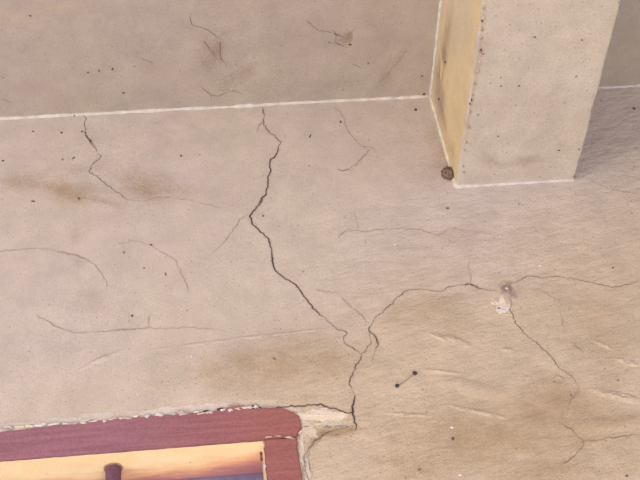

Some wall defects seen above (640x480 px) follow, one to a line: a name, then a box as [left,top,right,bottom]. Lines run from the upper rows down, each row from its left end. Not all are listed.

crack [83,115,221,208]
crack [3,248,107,285]
crack [221,107,640,479]
spalling [490,295,511,315]
crack [37,315,216,333]
flaking render [0,400,279,432]
spalling [279,407,348,480]